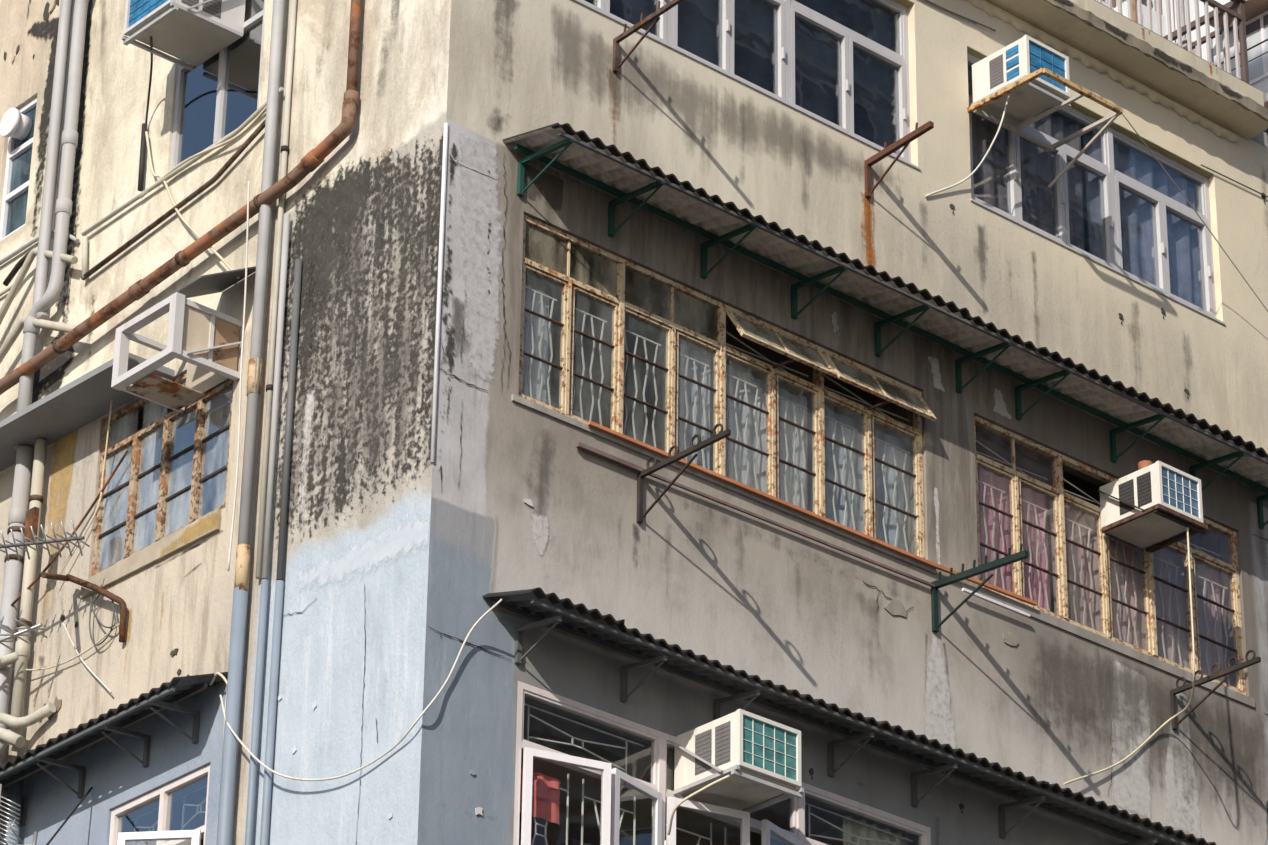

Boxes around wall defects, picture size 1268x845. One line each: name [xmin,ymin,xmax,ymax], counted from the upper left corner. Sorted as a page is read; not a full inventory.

water stain [725,110,843,163]
corrosion [861,196,875,266]
water stain [271,135,467,545]
corrosion [162,515,218,555]
peeling [523,499,549,555]
water stain [1042,650,1259,787]